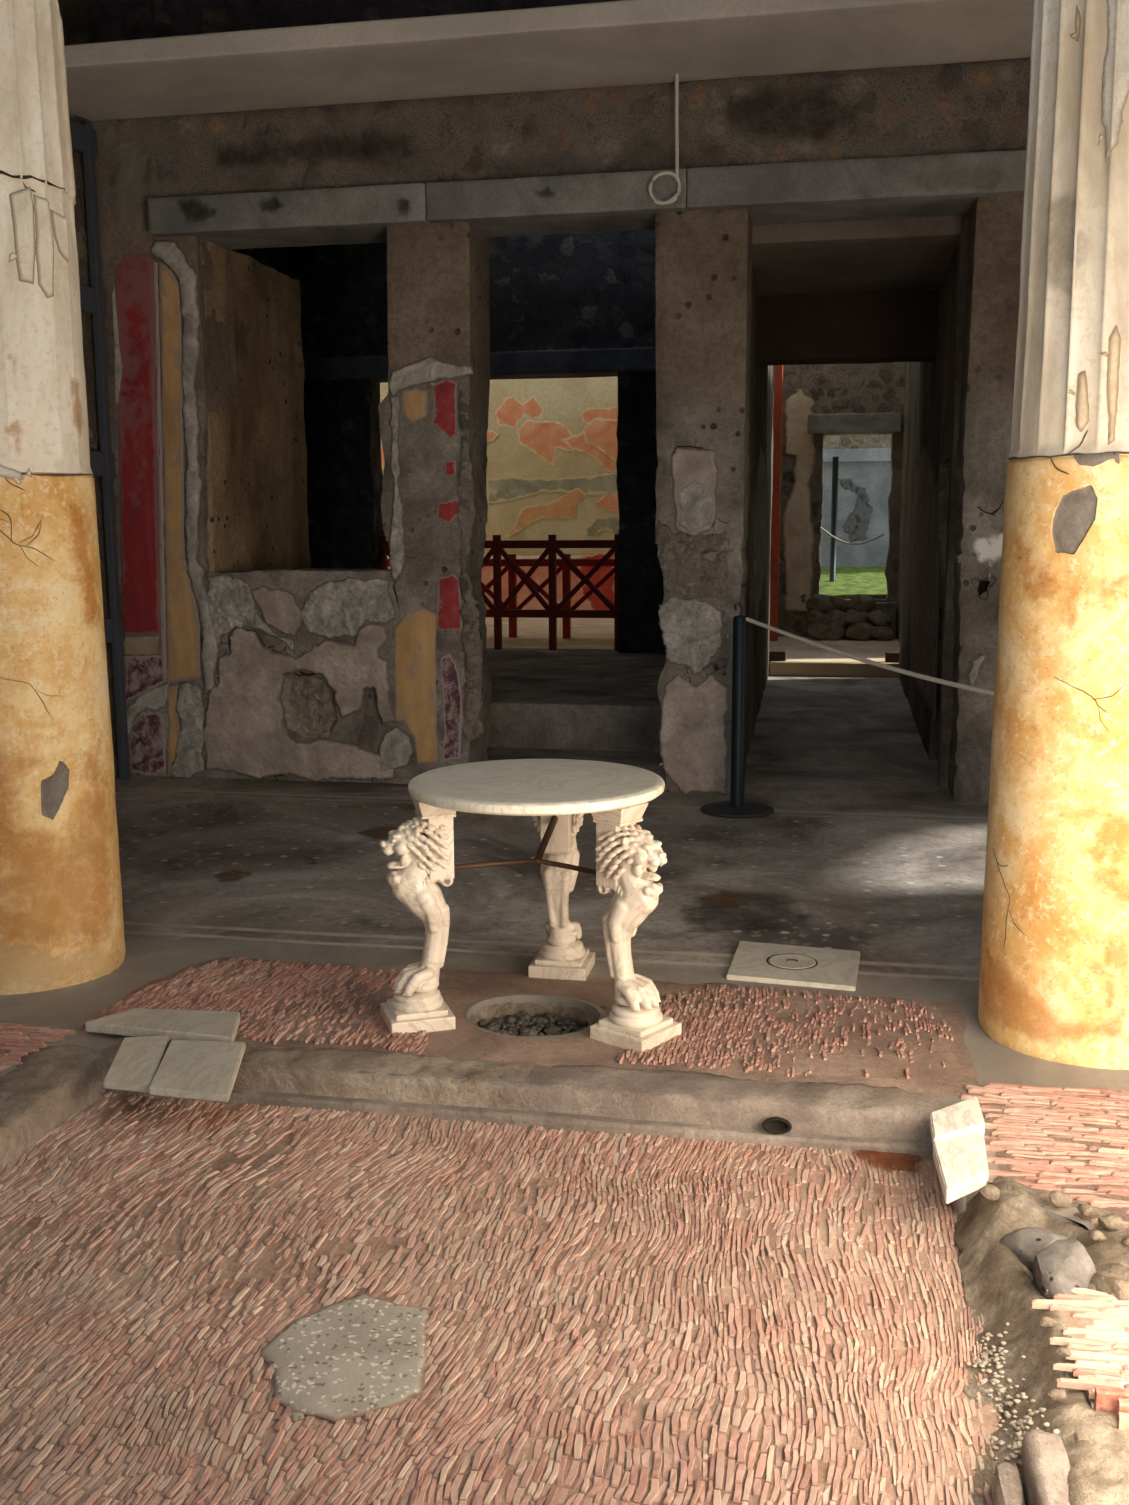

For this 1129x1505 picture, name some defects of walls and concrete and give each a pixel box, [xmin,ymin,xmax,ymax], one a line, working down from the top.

flaking render [1098,0,1129,162]
crack [0,170,67,193]
flaking render [8,187,69,298]
crack [0,473,93,567]
flaking render [192,573,396,782]